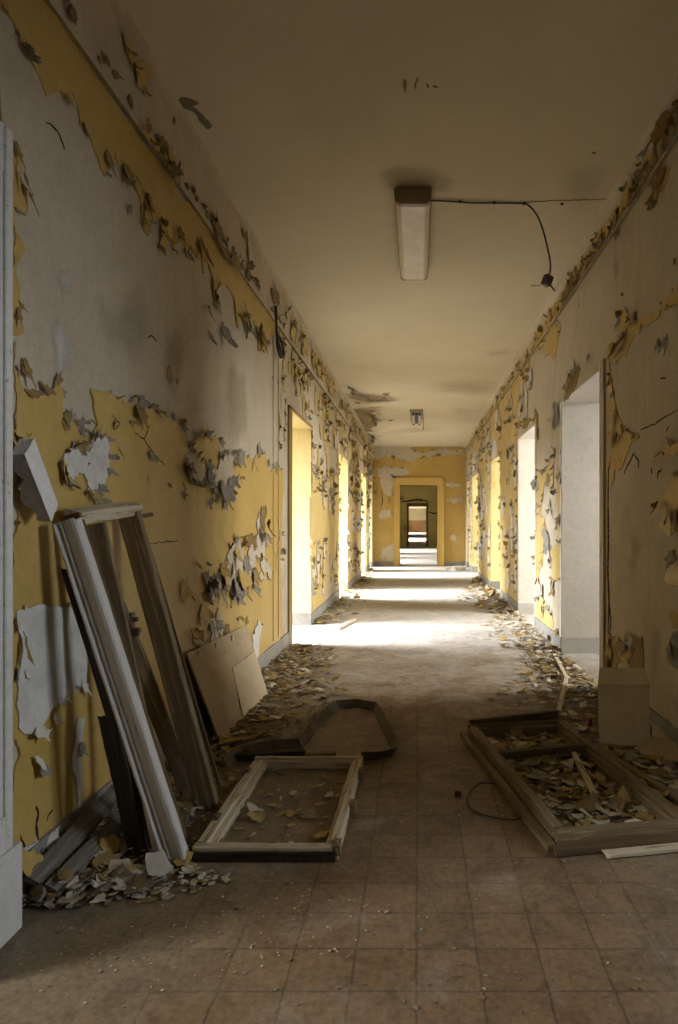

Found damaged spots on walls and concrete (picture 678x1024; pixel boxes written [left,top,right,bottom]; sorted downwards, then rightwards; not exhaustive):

peeling [13,139,344,876]
peeling [0,0,678,641]
peeling [604,630,644,668]
flaking render [665,611,678,669]